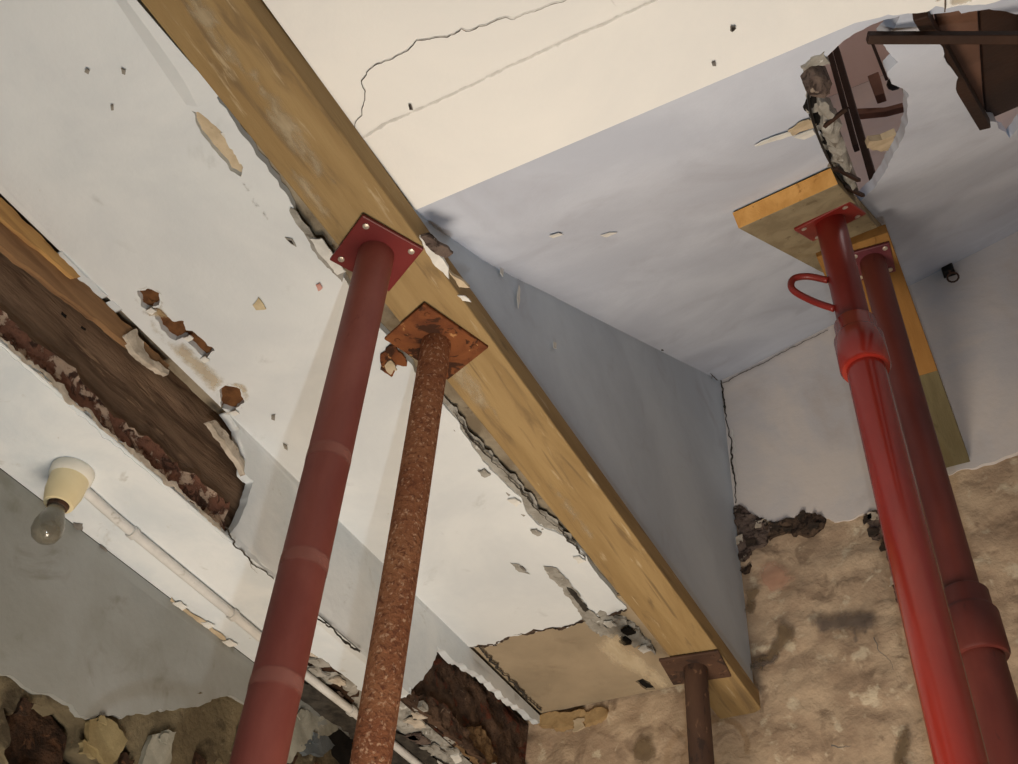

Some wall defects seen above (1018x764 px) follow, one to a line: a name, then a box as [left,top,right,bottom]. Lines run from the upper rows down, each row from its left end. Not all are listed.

peeling [196,112,243,172]
crack [354,0,566,128]
spalling [754,52,865,197]
spalling [865,128,896,152]
spalling [0,197,245,531]
spalling [0,676,243,764]
spalling [287,652,362,764]
spalling [391,566,689,764]
spalling [710,504,934,764]
spalling [949,455,1018,697]